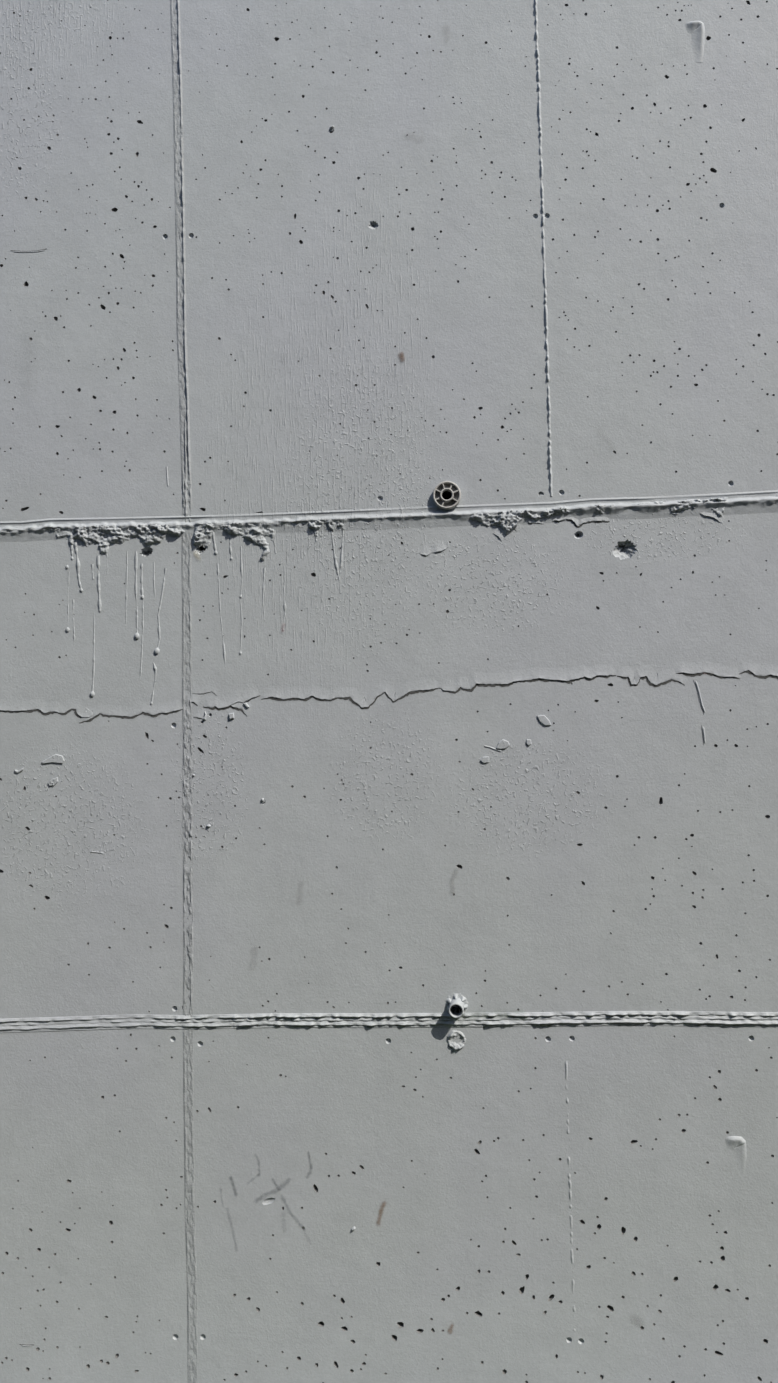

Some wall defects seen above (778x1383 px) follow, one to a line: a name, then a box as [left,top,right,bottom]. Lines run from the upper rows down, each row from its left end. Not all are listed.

spalling [463,495,615,541]
spalling [632,489,778,523]
spalling [612,539,637,560]
crack [0,659,778,745]